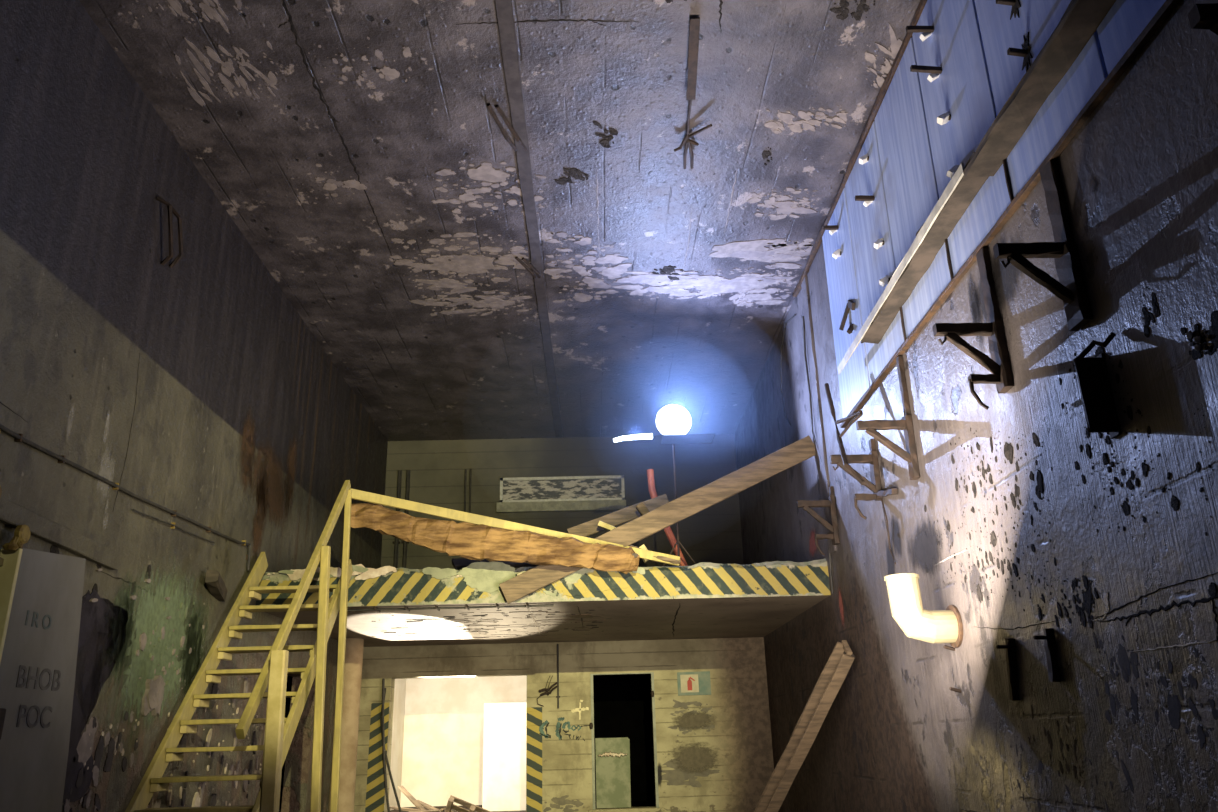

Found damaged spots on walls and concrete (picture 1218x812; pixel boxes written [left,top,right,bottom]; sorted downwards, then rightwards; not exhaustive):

peeling [390,162,818,316]
spalling [1180,311,1218,360]
corrosion [240,419,296,557]
crack [978,572,1218,652]
flaking render [63,564,205,812]
peeling [147,678,266,808]
leakage [675,713,713,729]
leakage [673,744,717,772]